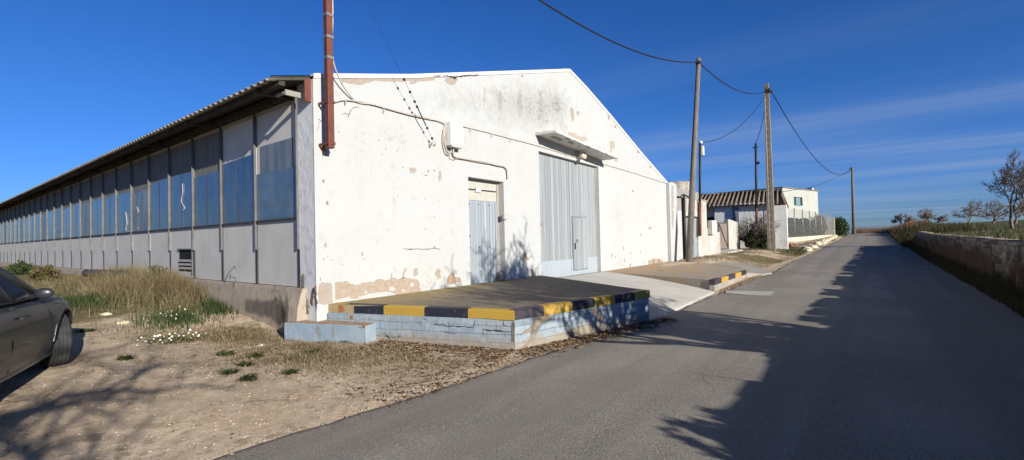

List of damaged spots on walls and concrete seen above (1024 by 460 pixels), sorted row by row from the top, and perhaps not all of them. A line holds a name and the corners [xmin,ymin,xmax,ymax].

peeling [341,76,458,85]
peeling [300,268,421,315]